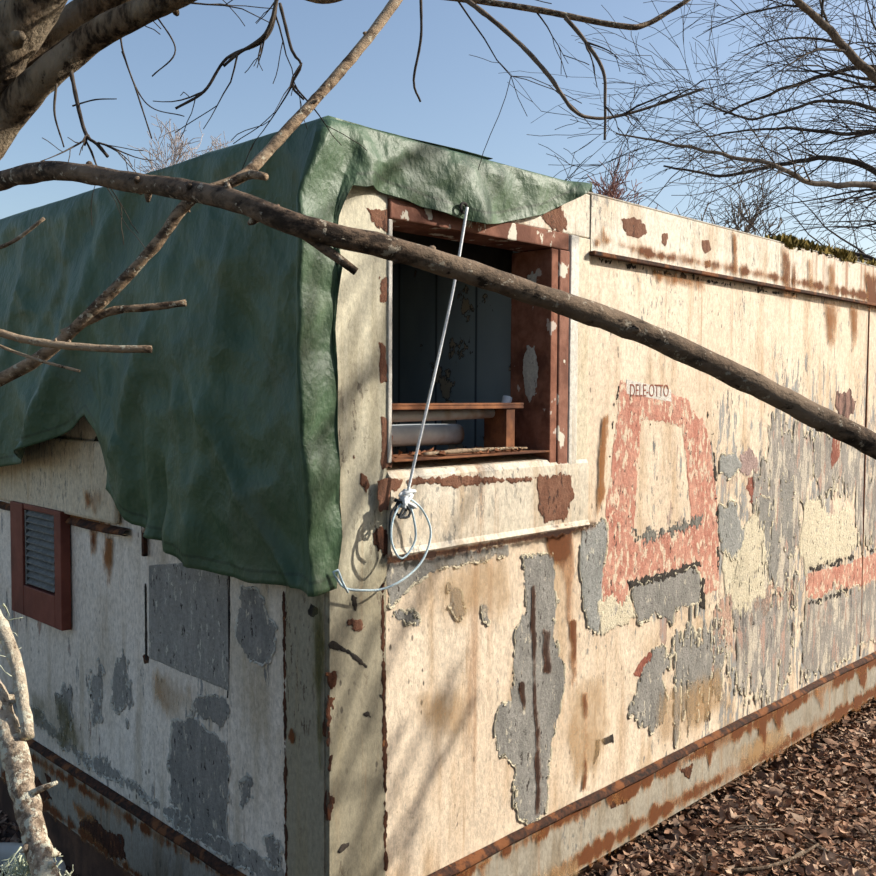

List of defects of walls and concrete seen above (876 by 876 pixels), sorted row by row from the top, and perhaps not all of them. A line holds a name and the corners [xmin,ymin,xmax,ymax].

peeling [523,345,538,403]
corrosion [622,217,876,343]
corrosion [30,753,177,876]
peeling [29,563,285,876]
corrosion [282,591,294,876]
peeling [386,544,509,627]
peeling [493,551,566,826]
corrosion [520,586,552,814]
corrosion [502,659,876,876]
peeling [578,409,876,749]